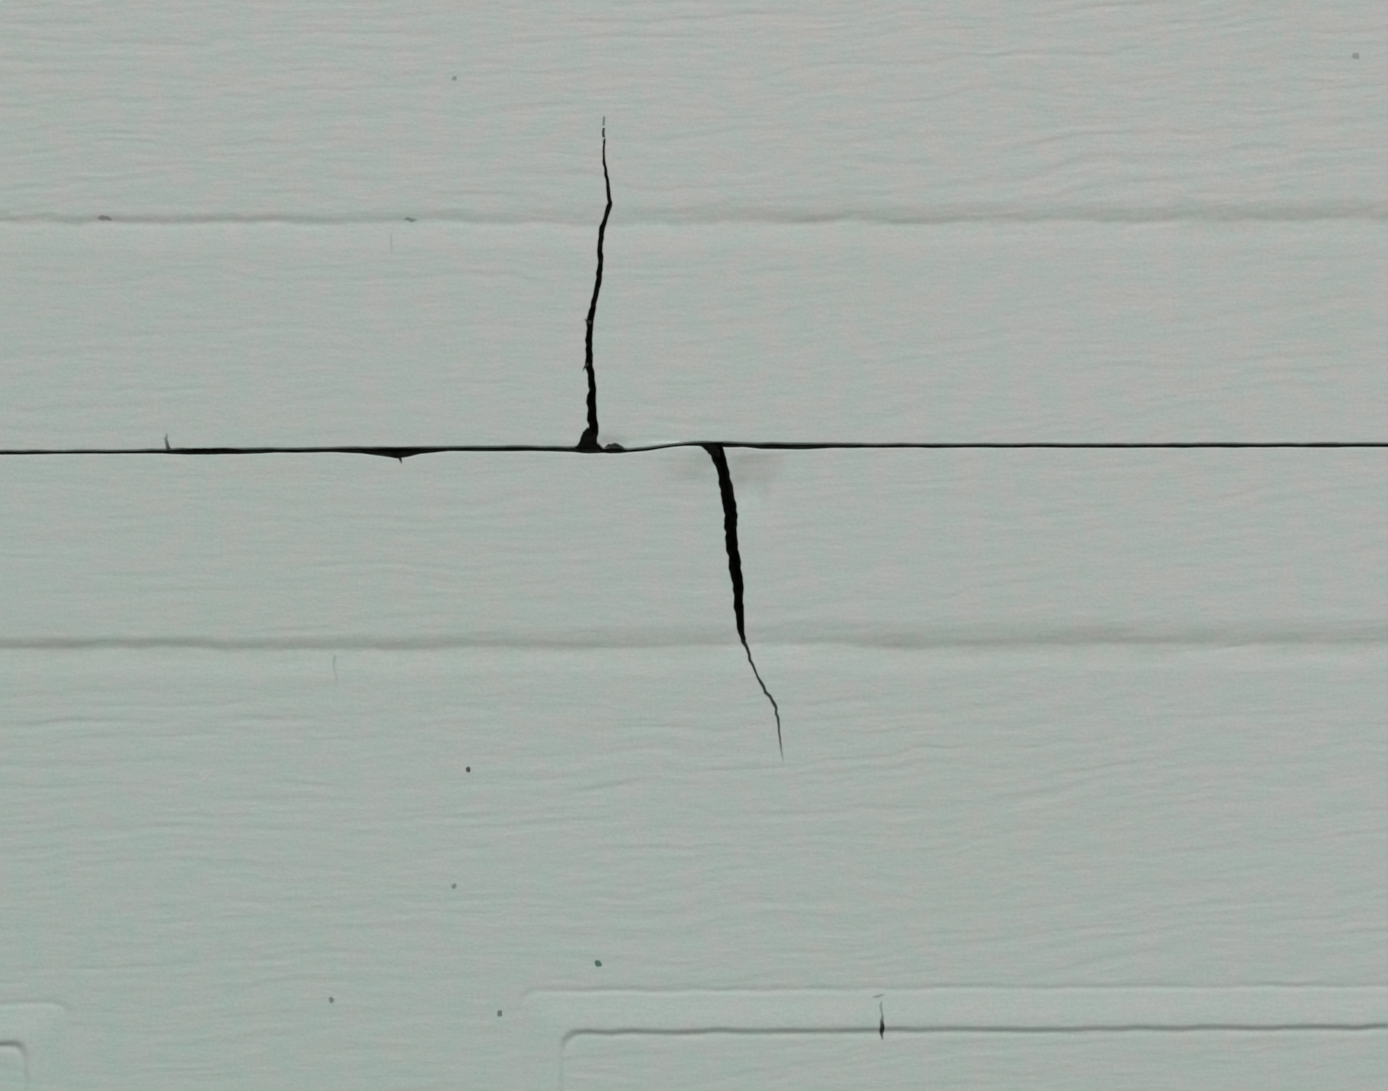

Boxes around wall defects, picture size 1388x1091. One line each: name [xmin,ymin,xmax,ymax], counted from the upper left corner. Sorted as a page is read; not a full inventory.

crack [576,128,624,449]
crack [700,442,781,743]